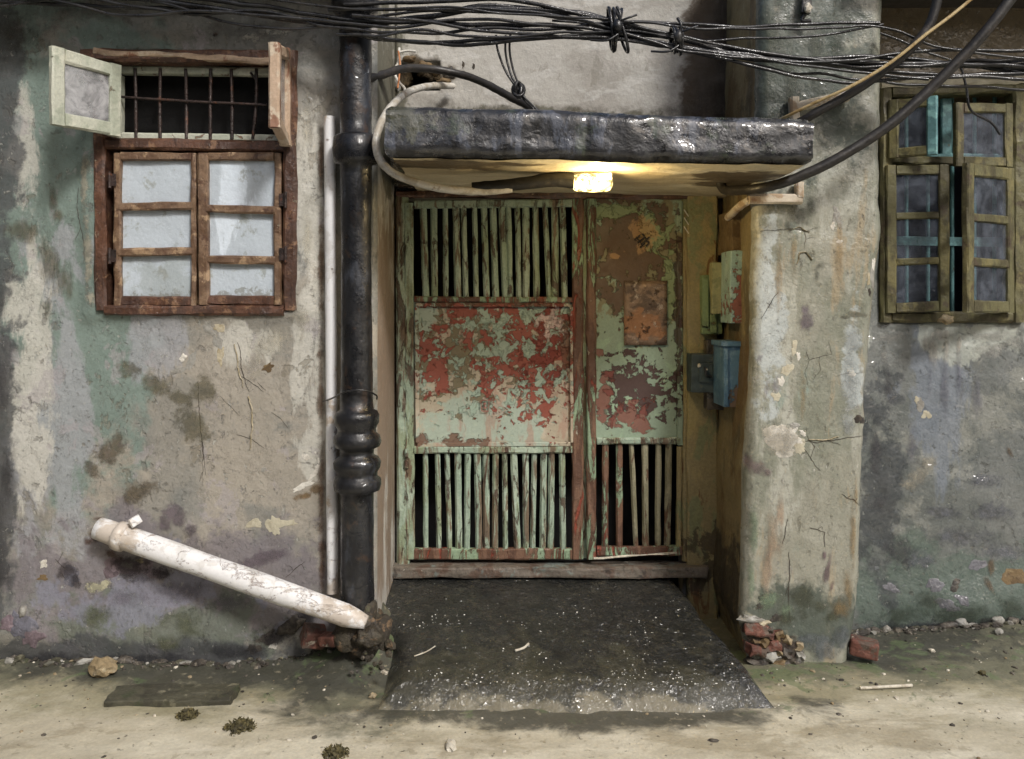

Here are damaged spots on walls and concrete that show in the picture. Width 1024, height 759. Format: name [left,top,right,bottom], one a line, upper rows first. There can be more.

leakage [122,364,215,440]
crack [198,342,264,482]
leakage [86,434,123,476]
peeling [763,422,806,458]
crack [804,436,860,470]
leakage [125,483,156,502]
leakage [86,580,110,593]